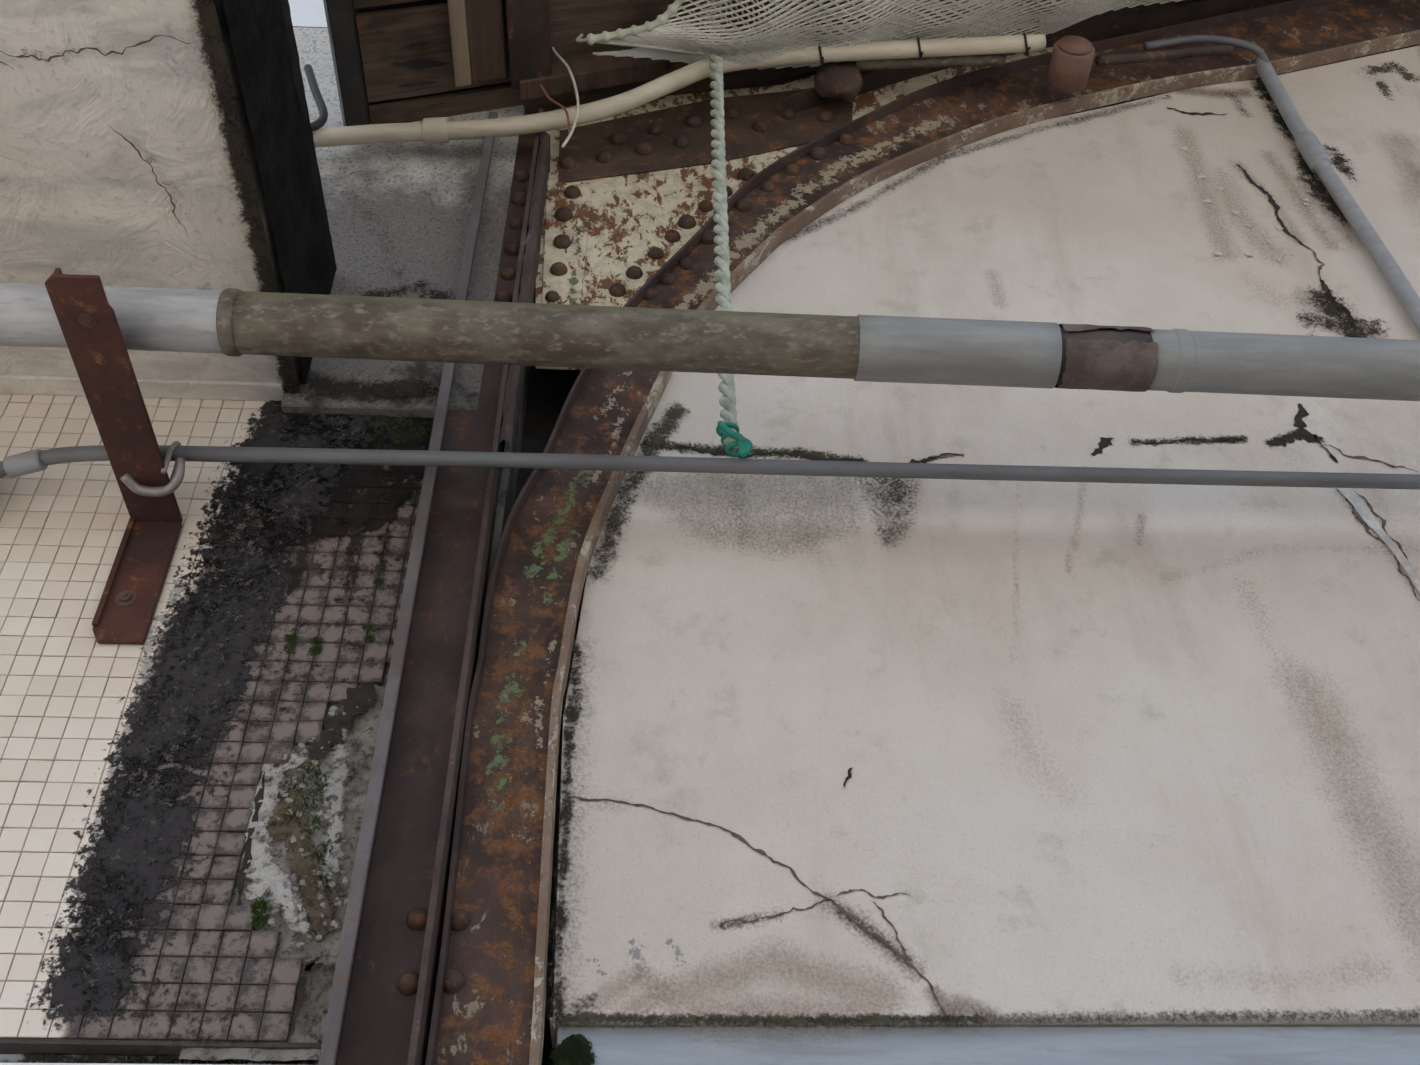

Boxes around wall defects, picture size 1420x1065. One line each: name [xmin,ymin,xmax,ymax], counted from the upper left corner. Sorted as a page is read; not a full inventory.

crack [0,35,200,69]
crack [109,125,188,236]
water stain [190,0,337,295]
water stain [363,272,453,300]
rust [584,239,628,307]
crack [1236,164,1359,332]
crack [1091,403,1420,601]
water stain [27,356,440,1061]
spalling [179,664,390,1061]
crack [569,796,945,1014]